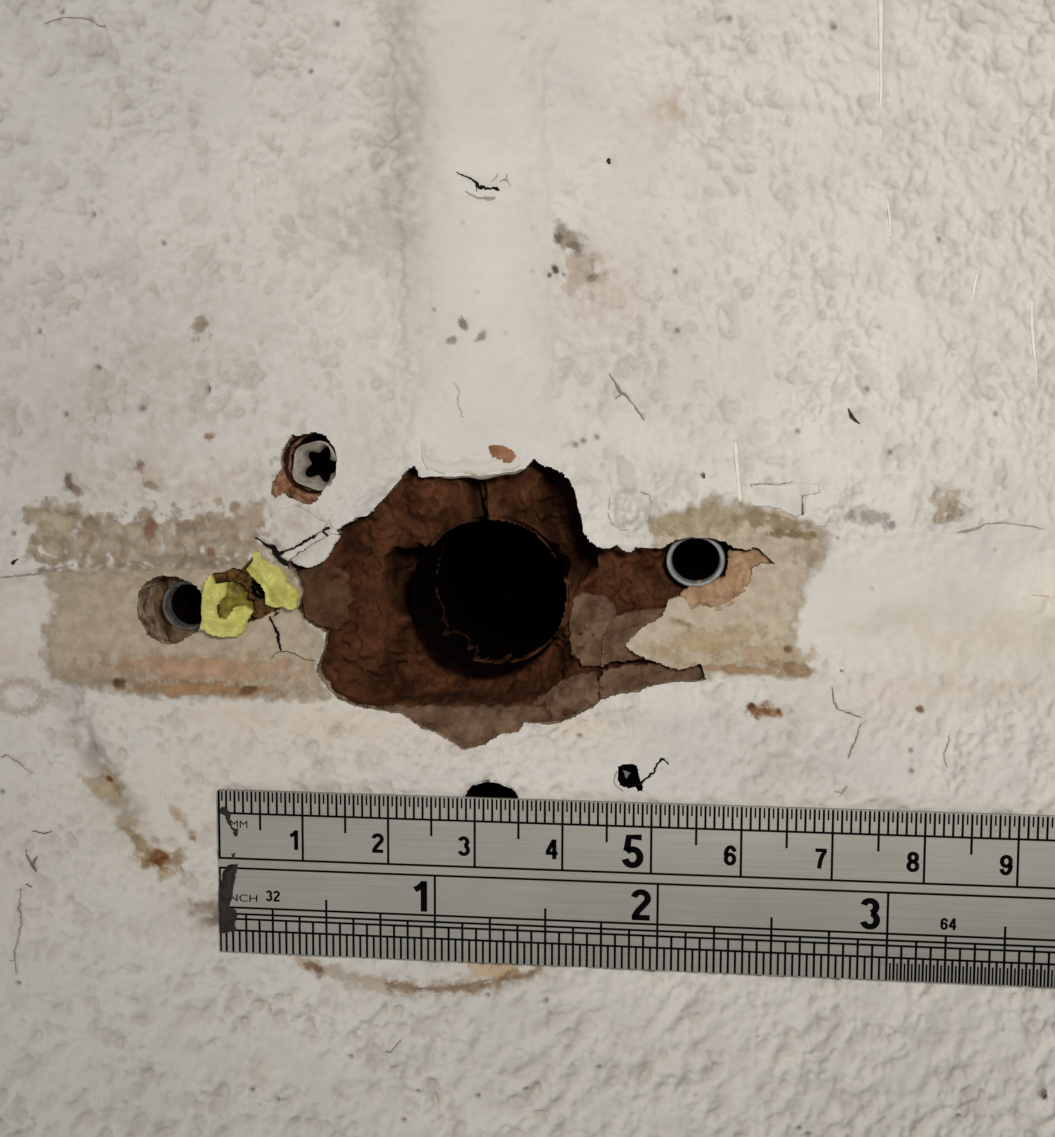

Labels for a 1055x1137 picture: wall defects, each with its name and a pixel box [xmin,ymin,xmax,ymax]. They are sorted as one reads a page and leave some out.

crack [0,565,74,578]
spalling [21,434,830,750]